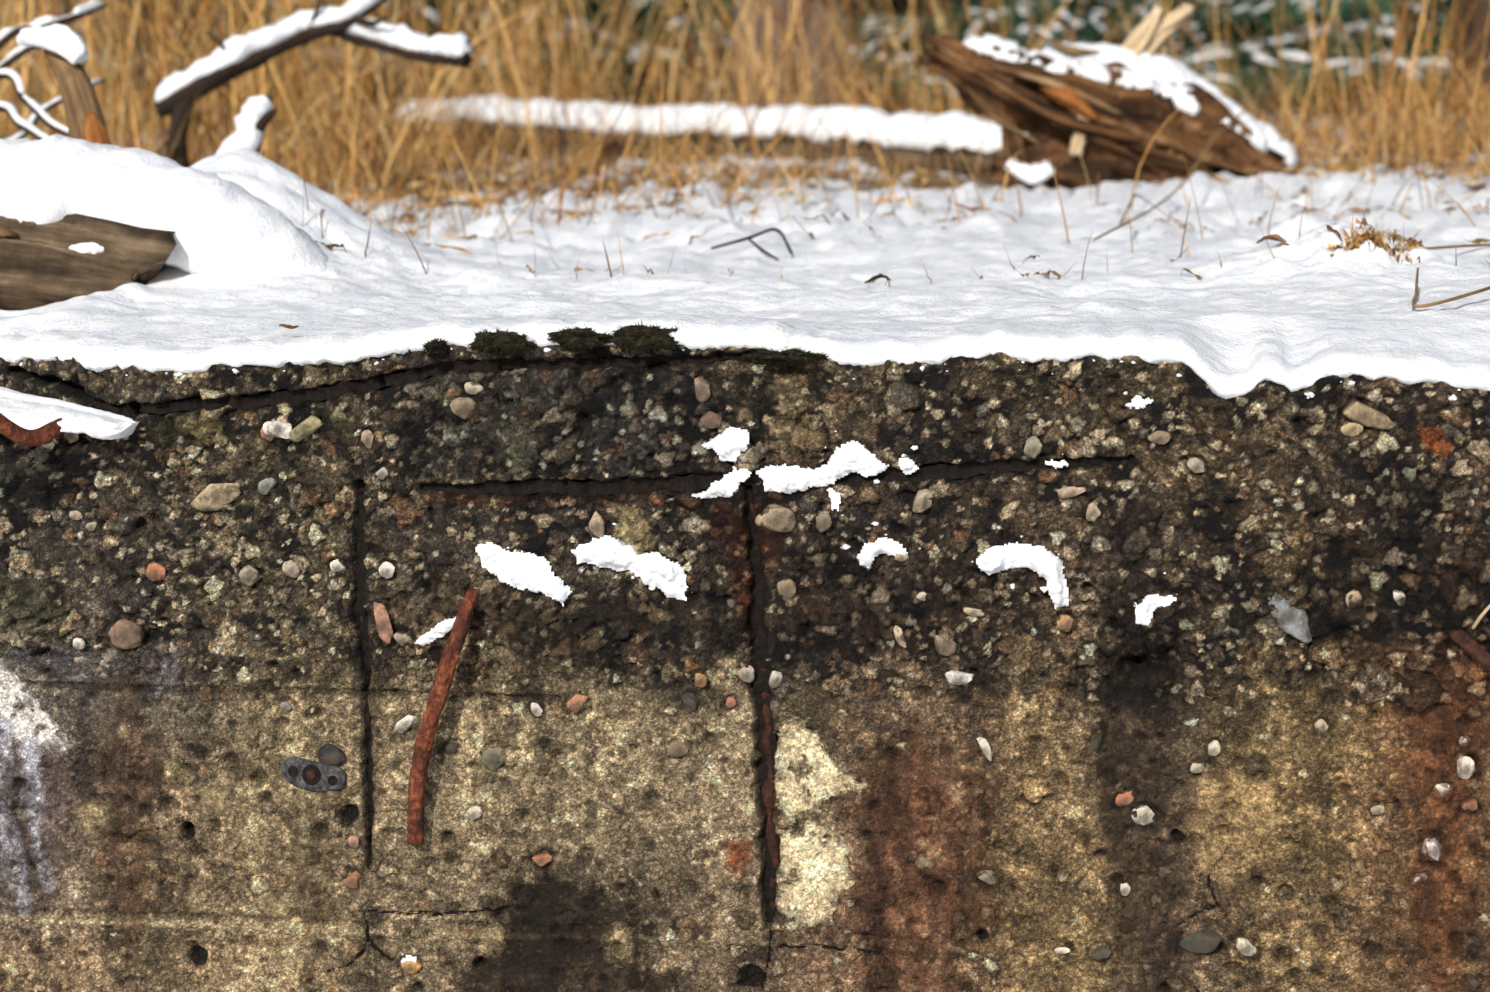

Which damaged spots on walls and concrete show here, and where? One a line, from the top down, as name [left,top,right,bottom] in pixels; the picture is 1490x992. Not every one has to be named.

crack [835,455,1132,484]
damp [0,647,177,933]
crack [353,482,374,864]
rust [407,585,480,846]
crack [423,472,888,992]
rust [842,728,1002,992]
damp [1097,502,1194,992]
rust [1379,628,1490,992]